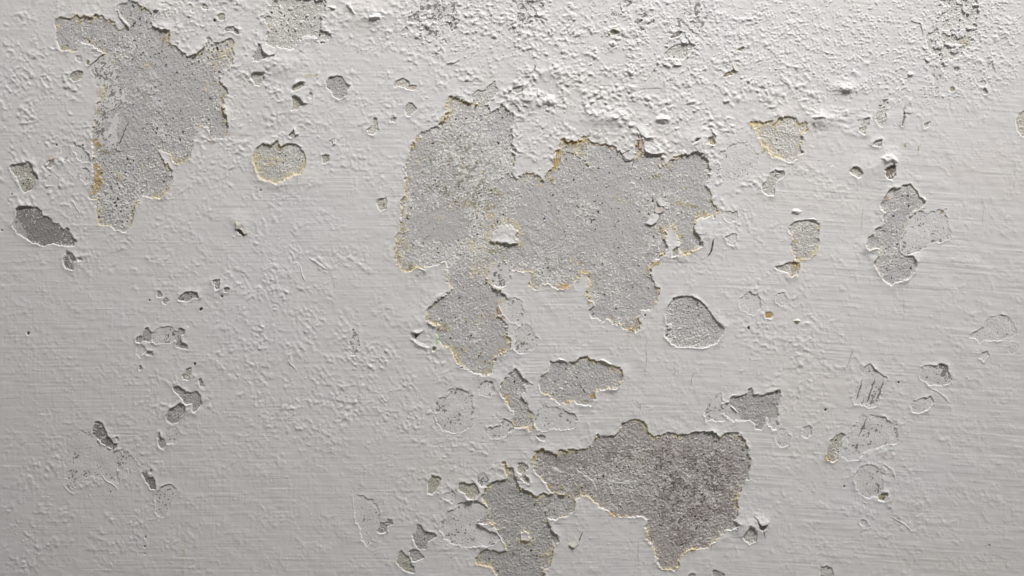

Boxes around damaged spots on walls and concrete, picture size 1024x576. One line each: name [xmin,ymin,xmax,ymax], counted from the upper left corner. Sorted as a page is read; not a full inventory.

peeling [55,0,239,232]
peeling [255,126,305,191]
peeling [753,117,806,195]
peeling [1,206,81,270]
peeling [396,81,723,376]
peeling [775,220,819,276]
peeling [866,165,925,285]
peeling [176,328,188,349]
peeling [729,388,780,430]
peeling [428,476,441,494]
peeling [458,357,771,576]
peeling [397,520,444,573]